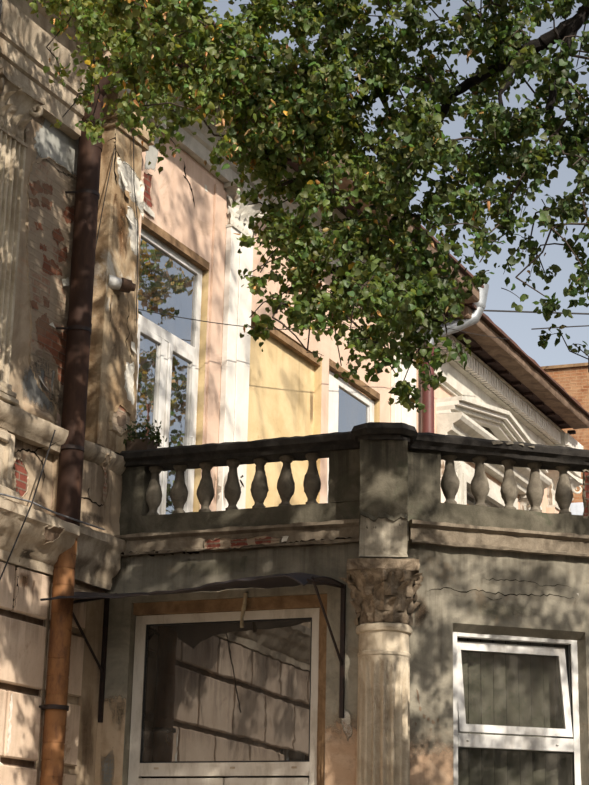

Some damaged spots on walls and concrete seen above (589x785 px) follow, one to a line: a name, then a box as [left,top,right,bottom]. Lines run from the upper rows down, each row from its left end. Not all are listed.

flaking render [26,156,76,418]
flaking render [12,457,29,501]
crack [15,442,56,487]
flaking render [203,535,289,553]
crack [425,578,576,604]